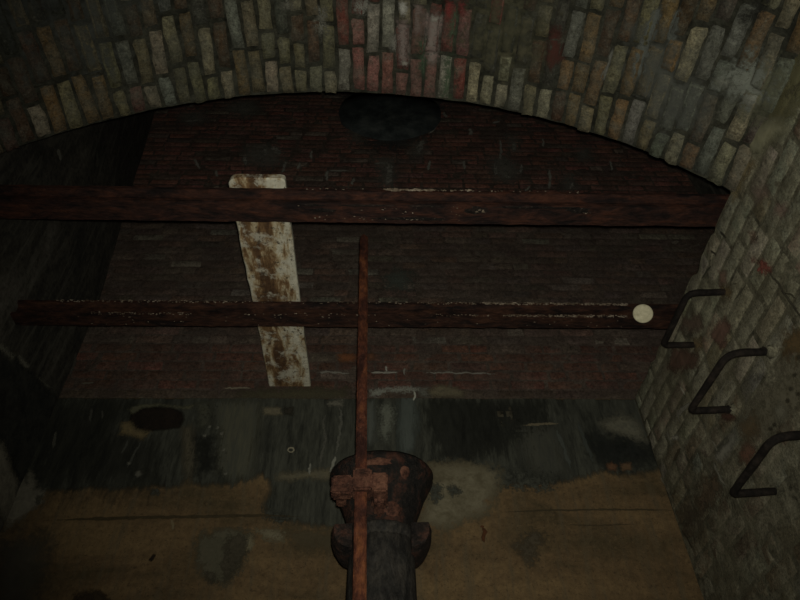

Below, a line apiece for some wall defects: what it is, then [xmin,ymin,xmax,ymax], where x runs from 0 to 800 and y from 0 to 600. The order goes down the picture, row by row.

rust [369,301,628,327]
damp [180,386,350,488]
damp [367,384,463,453]
damp [597,414,648,443]